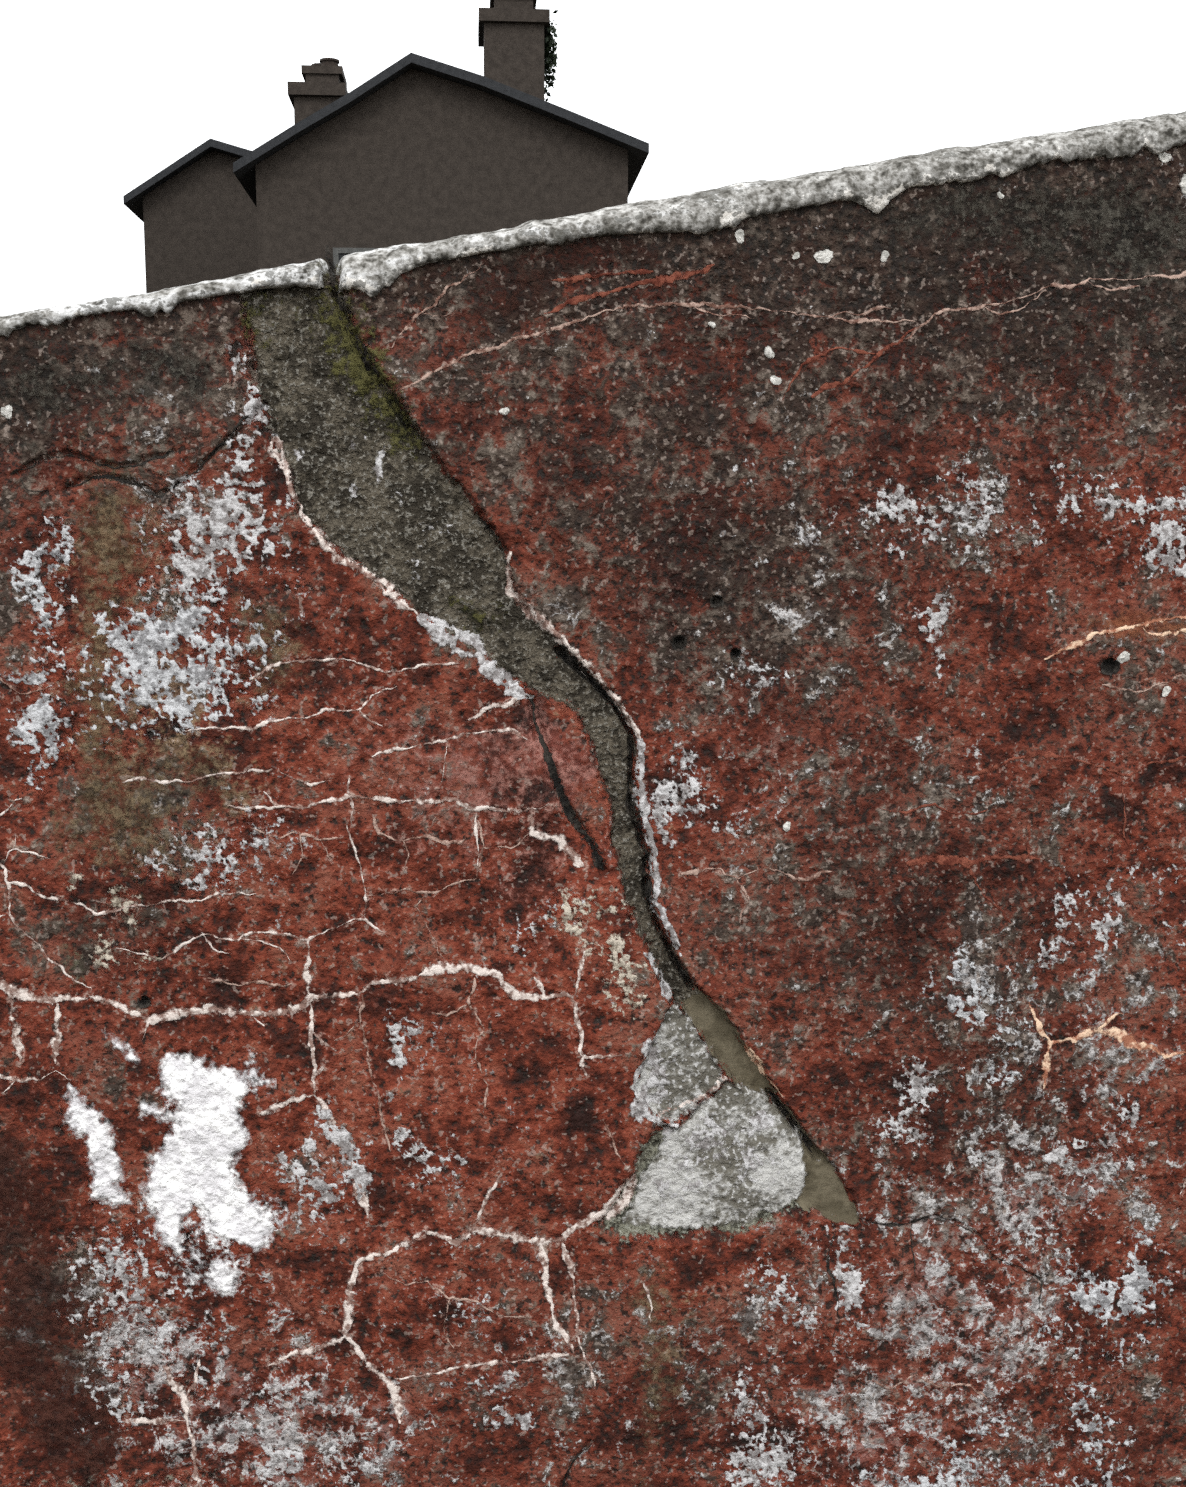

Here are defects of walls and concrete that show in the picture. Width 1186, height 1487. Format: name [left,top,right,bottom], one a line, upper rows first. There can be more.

leakage [66,495,168,848]
crack [0,245,1186,1424]
leakage [112,1039,137,1061]
leakage [66,1053,287,1296]